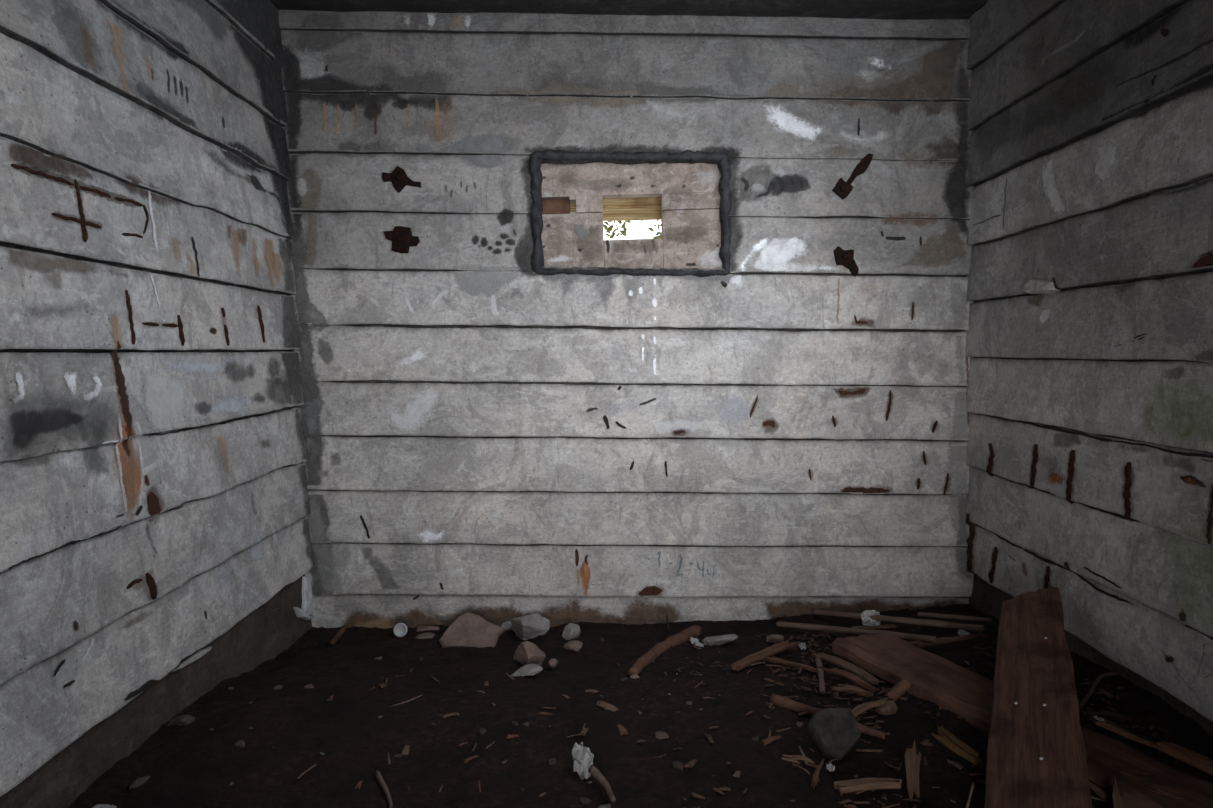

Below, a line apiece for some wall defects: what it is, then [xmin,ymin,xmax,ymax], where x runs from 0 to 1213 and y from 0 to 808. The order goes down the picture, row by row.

water stain [510,79,716,107]
water stain [767,84,820,139]
water stain [472,145,683,320]
water stain [676,147,831,286]
water stain [12,373,104,469]
rust [111,317,143,505]
rust [575,549,590,594]
water stain [345,601,678,629]
water stain [768,599,964,619]